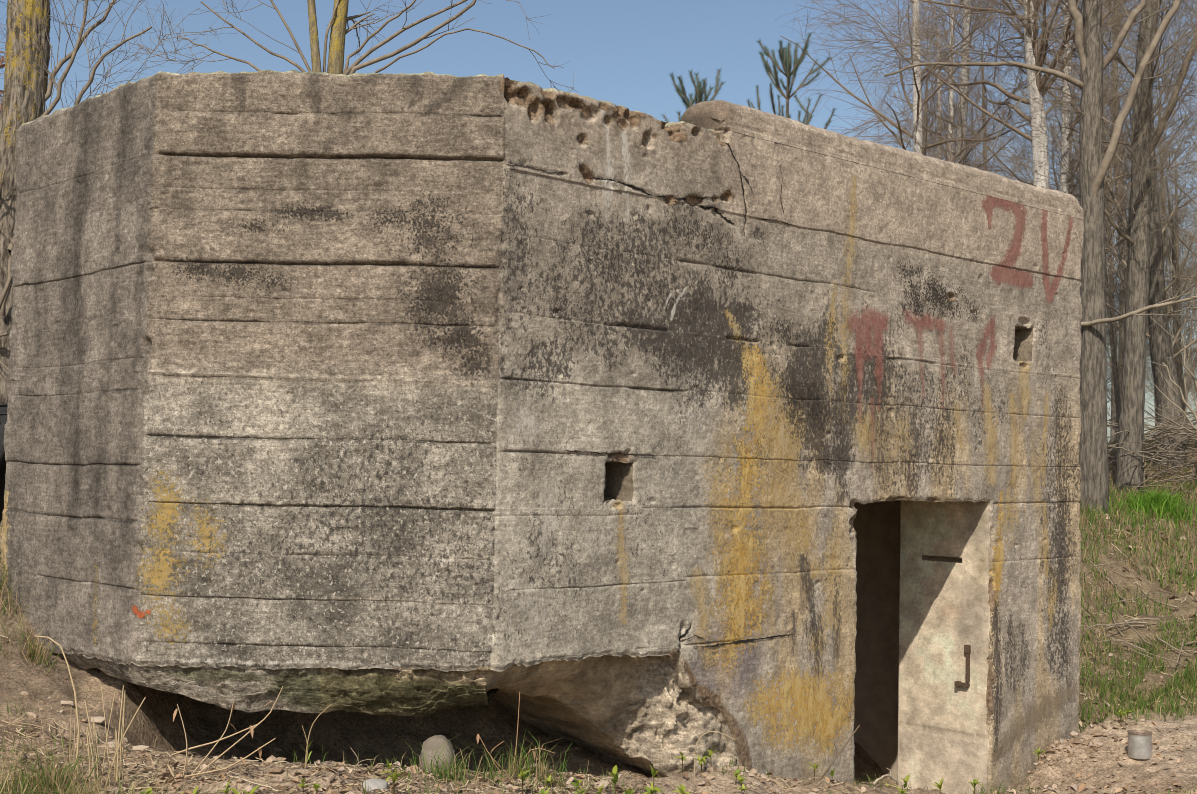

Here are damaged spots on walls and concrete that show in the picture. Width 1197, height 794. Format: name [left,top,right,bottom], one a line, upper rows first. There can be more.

spalling [499,77,725,148]
crack [507,141,788,241]
water stain [564,244,697,320]
water stain [666,220,754,294]
water stain [690,175,927,683]
water stain [942,399,964,496]
water stain [981,361,1075,756]
crack [678,620,796,652]
spalling [669,649,753,771]